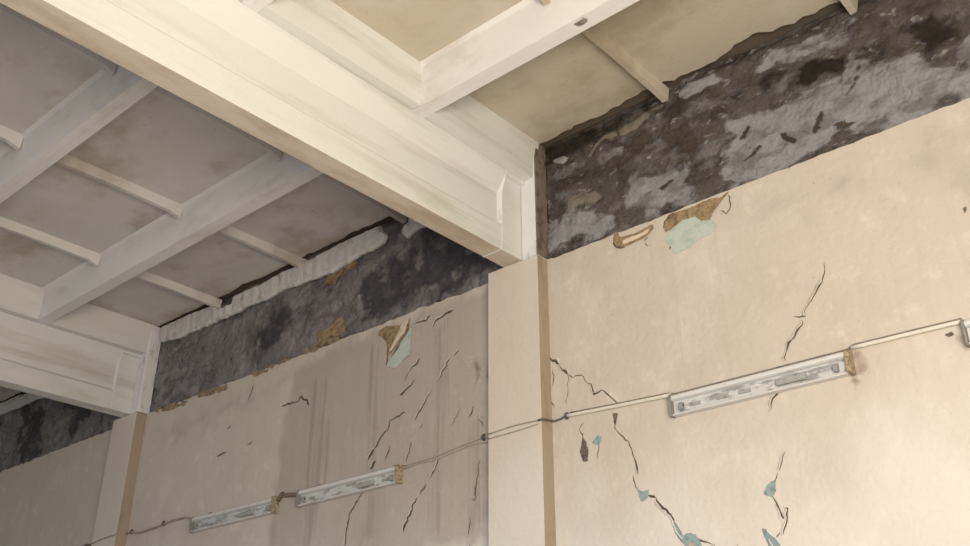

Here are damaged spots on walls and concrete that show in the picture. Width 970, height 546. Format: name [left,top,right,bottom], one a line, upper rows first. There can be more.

spalling [545,0,970,259]
spalling [149,217,504,413]
crack [414,308,453,327]
crack [781,265,825,361]
crack [367,349,458,469]
crack [550,357,619,406]
crack [768,393,778,412]
crack [402,458,438,533]
crack [467,461,480,546]
crack [614,427,738,546]
crack [762,450,788,546]